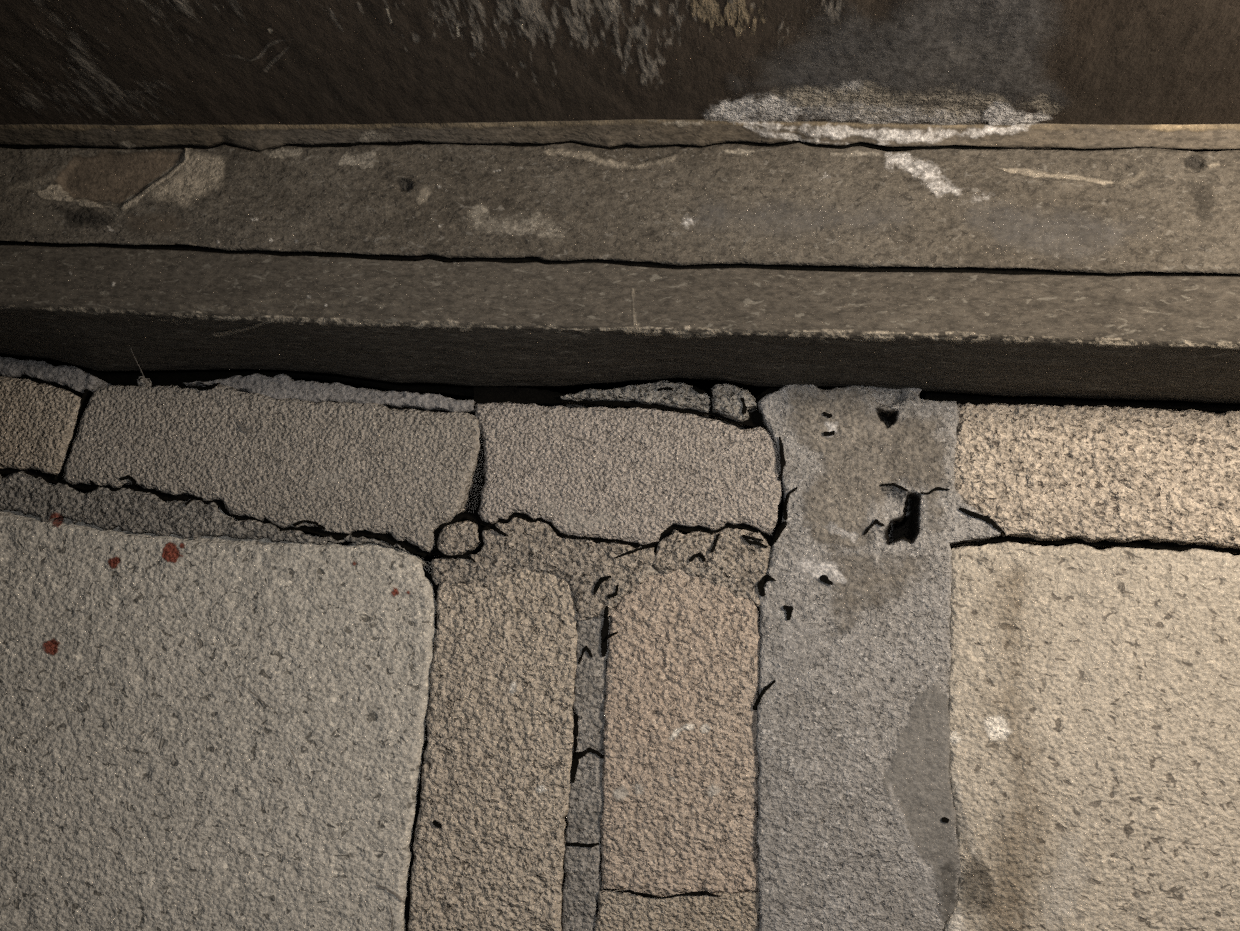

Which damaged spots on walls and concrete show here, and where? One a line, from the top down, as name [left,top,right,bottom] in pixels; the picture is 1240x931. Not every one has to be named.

efflorescence [675,0,1060,194]
crack [0,242,1240,335]
spalling [877,408,898,427]
crack [0,354,798,664]
crack [863,519,884,535]
hole [885,492,921,544]
crack [880,483,1240,553]
crack [570,714,604,783]
crack [376,691,430,931]